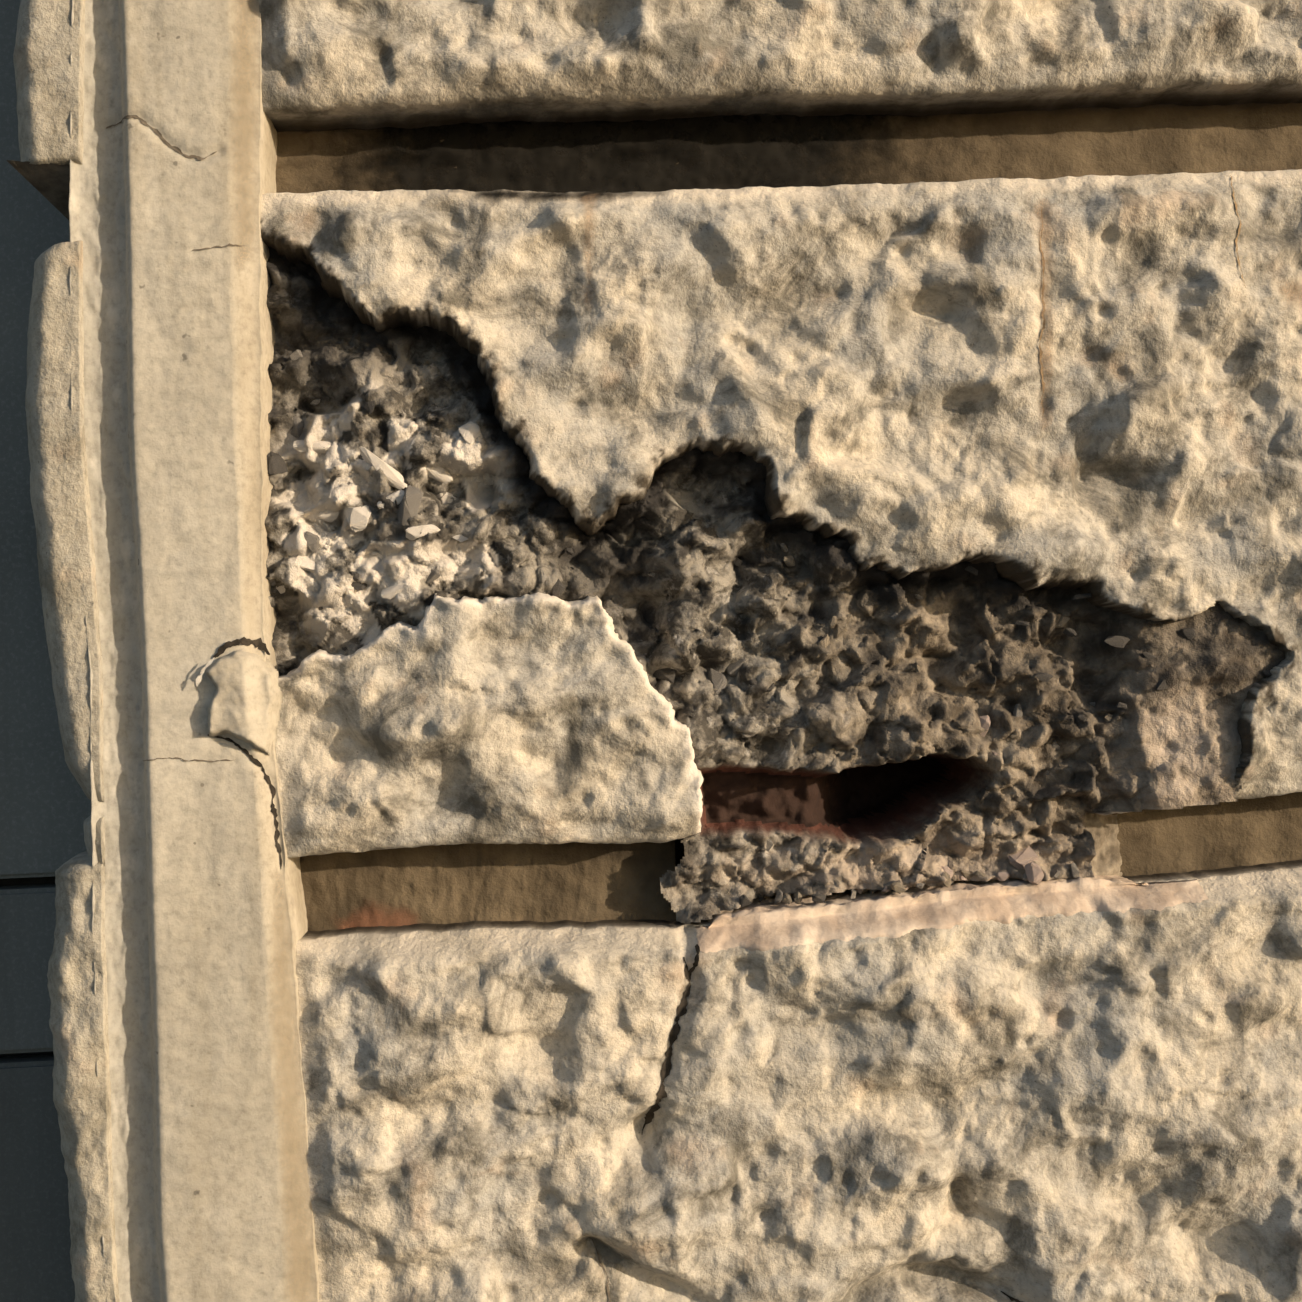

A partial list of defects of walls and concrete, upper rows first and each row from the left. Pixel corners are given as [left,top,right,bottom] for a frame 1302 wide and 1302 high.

crack [106,115,217,160]
spalling [196,247,1285,953]
crack [144,734,282,867]
crack [642,944,700,1133]